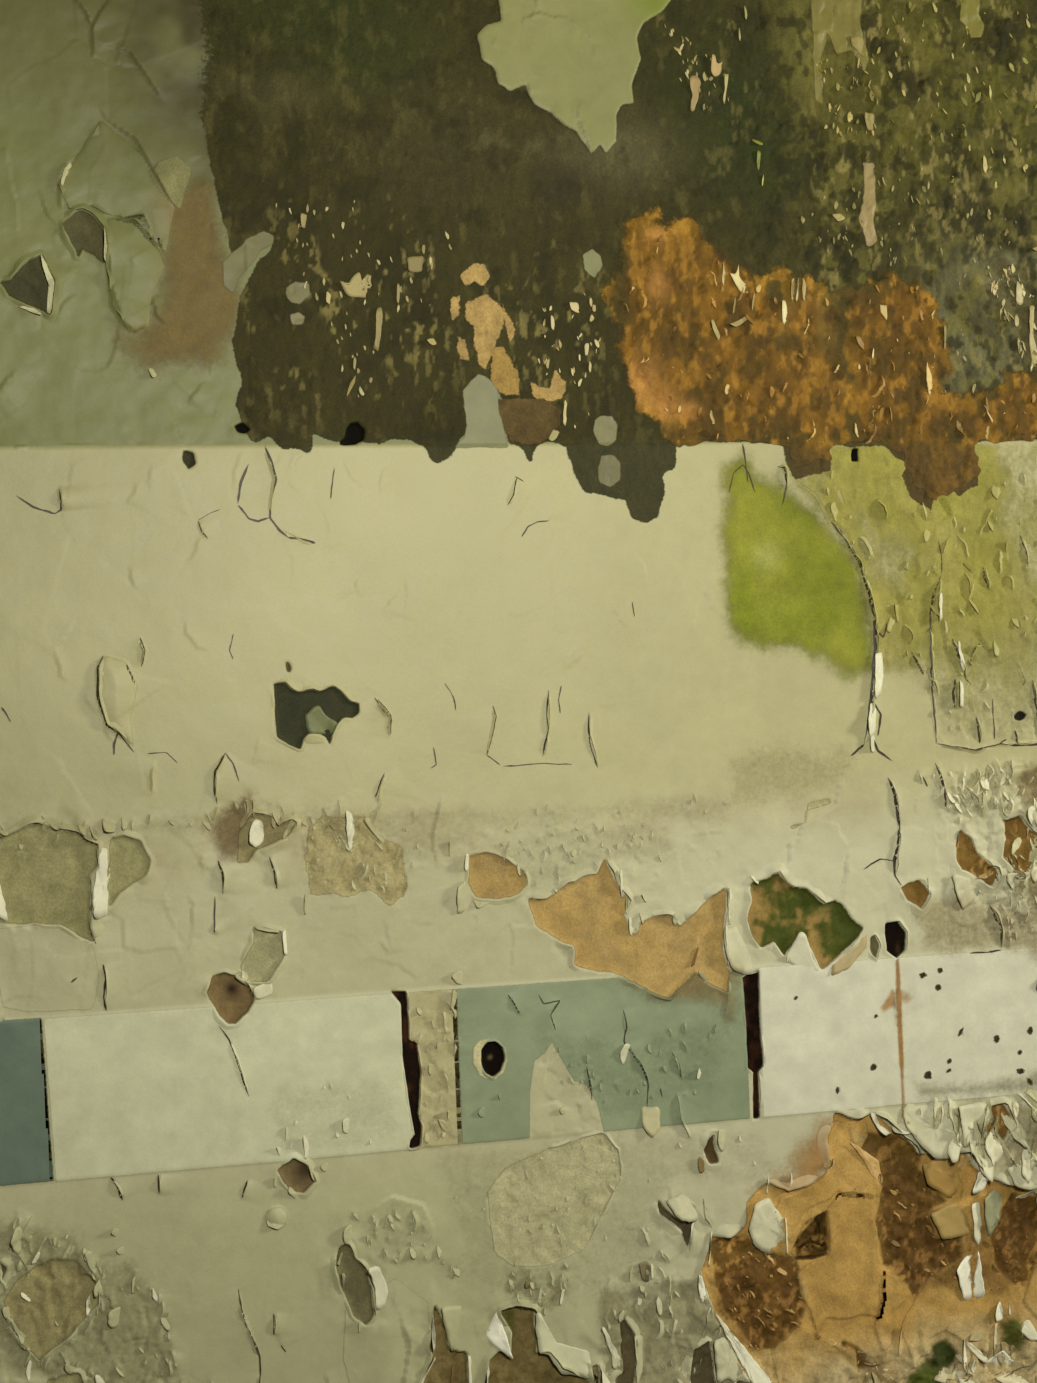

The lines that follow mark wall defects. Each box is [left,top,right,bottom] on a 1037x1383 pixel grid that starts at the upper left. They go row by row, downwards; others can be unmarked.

peeling [0,249,60,322]
water stain [135,0,1037,523]
corrosion [602,207,1037,500]
crack [198,447,315,546]
peeling [271,662,362,752]
peeling [868,653,884,753]
peeling [0,798,407,943]
peeling [449,841,937,1002]
peeling [417,970,507,1143]
peeling [0,1216,178,1383]
peeling [330,1210,460,1333]
peeling [418,1050,1037,1383]